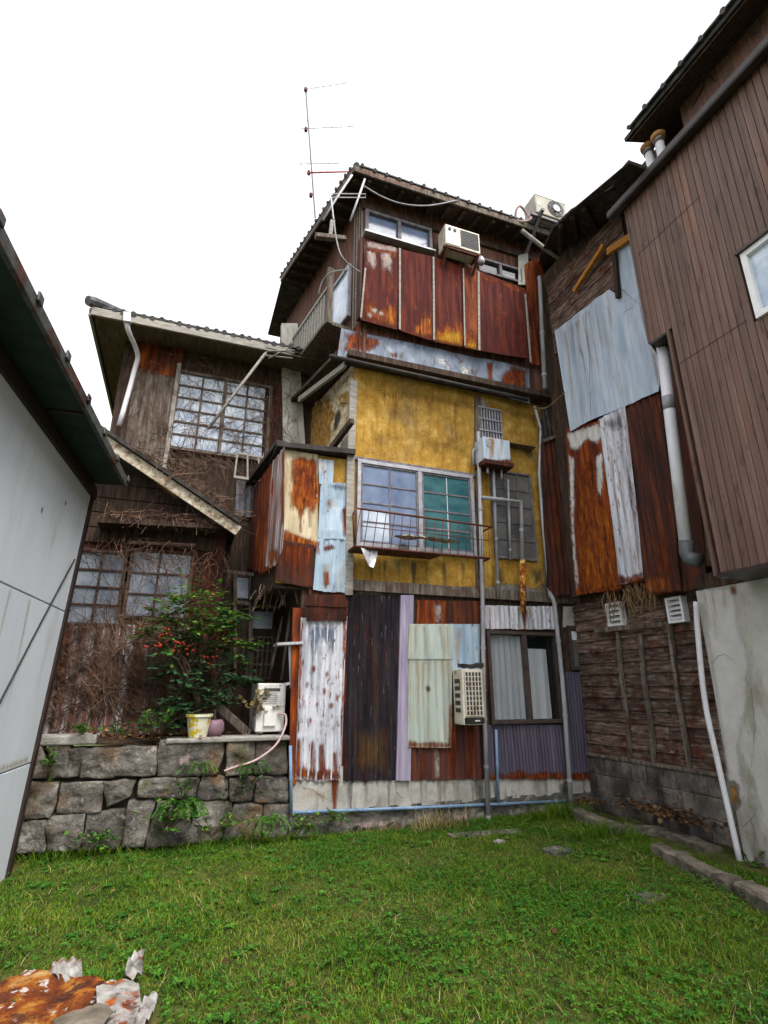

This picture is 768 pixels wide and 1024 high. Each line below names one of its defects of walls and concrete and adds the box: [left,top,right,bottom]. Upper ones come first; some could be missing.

rust [370,247,397,260]
rust [345,333,379,351]
rust [366,304,395,325]
rust [415,315,477,348]
rust [487,362,525,397]
rust [269,452,333,578]
peeling [567,424,601,584]
rust [579,461,670,593]
rust [510,559,527,632]
rust [296,621,347,809]
rust [409,706,474,778]